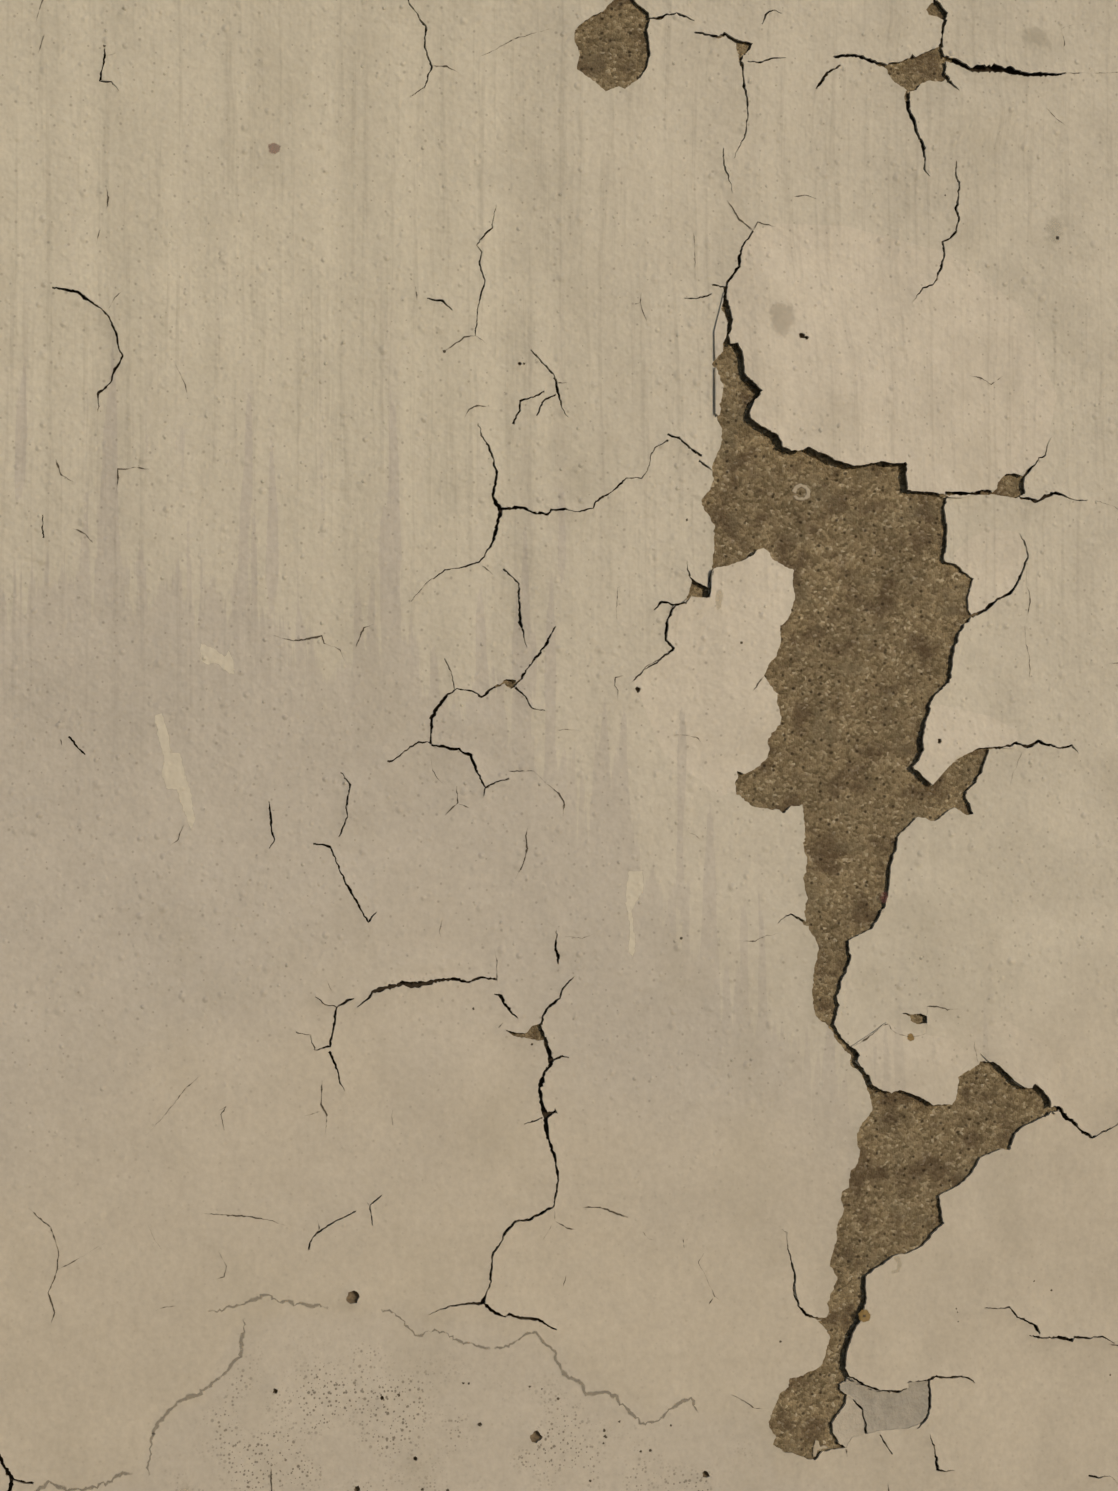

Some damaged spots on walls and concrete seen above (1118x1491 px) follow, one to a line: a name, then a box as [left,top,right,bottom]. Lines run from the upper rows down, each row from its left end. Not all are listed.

peeling [574,0,657,91]
peeling [816,0,1062,171]
crack [657,10,780,299]
crack [915,167,960,299]
crack [52,287,123,409]
crack [387,352,703,813]
crack [978,541,1031,667]
crack [995,740,1074,749]
peeling [633,223,1083,1460]
crack [296,932,624,1329]
crack [34,1213,76,1320]
crack [986,1306,1118,1346]